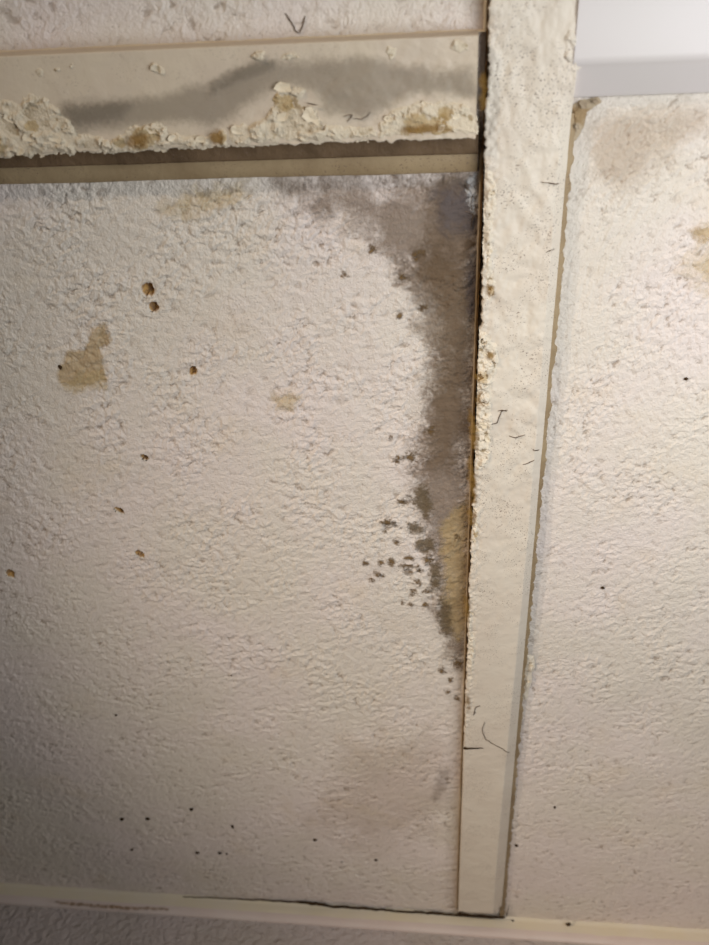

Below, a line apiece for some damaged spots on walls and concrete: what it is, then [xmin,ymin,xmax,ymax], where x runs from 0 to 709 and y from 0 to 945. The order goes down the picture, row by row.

peeling [0,81,479,159]
damp [59,325,109,384]
crack [183,0,539,922]
damp [353,173,478,701]
flaking render [474,326,499,470]